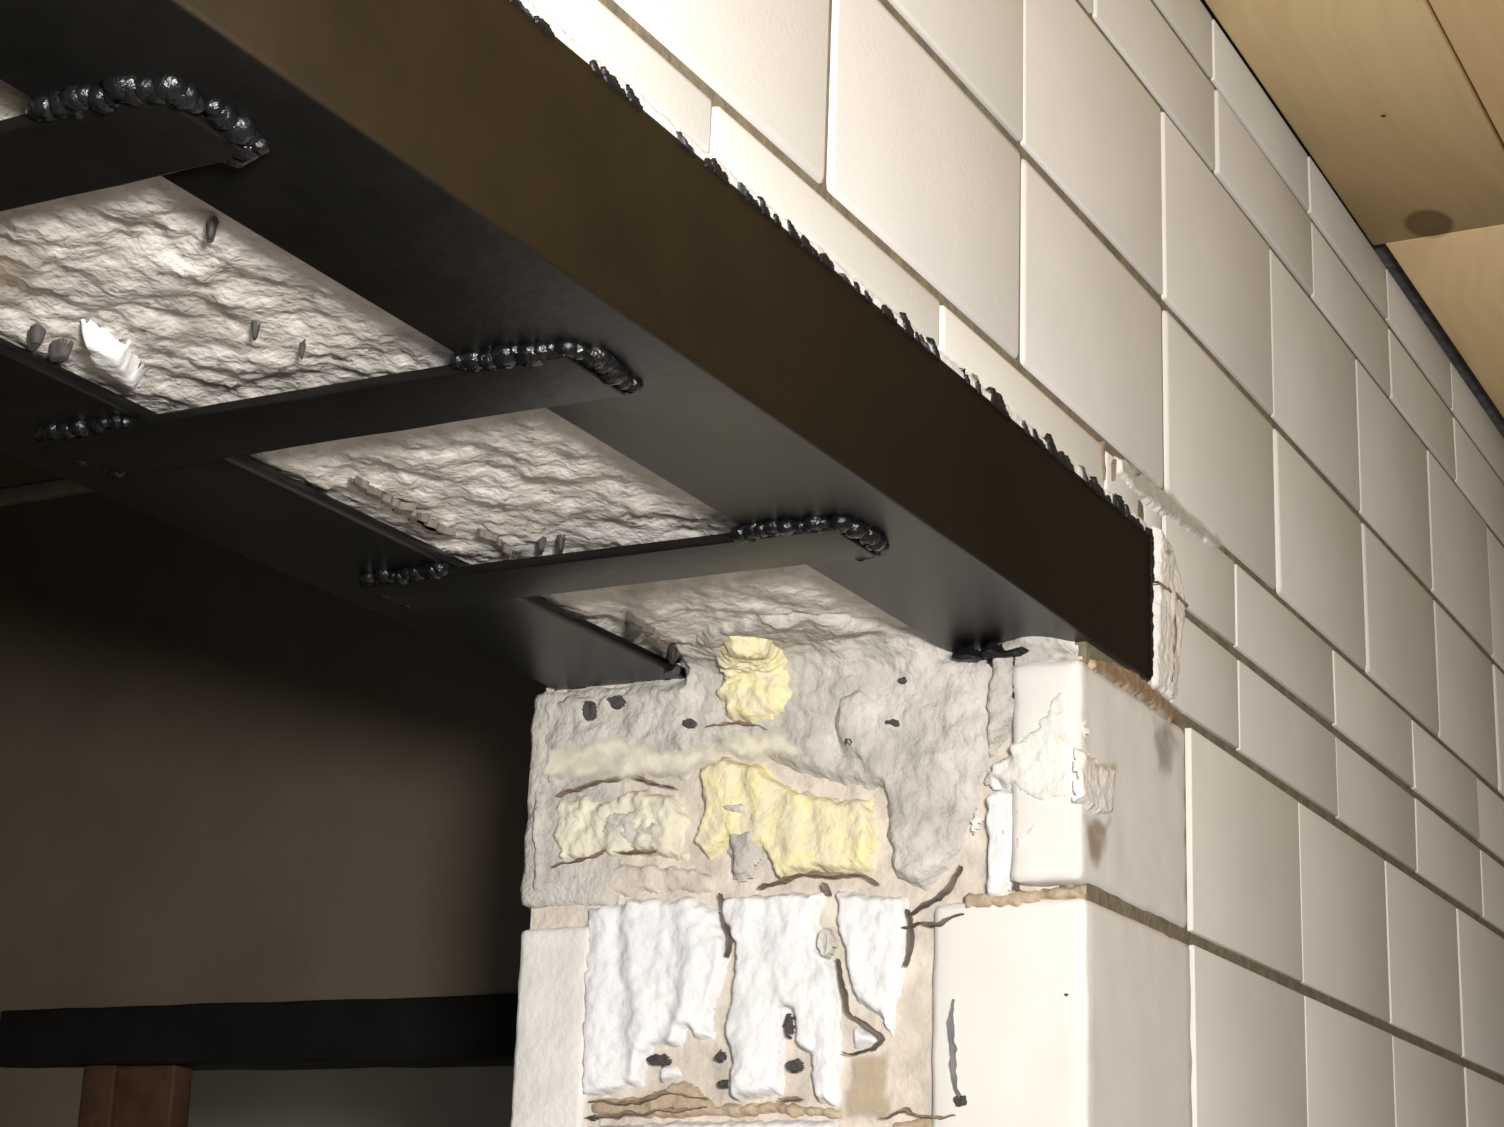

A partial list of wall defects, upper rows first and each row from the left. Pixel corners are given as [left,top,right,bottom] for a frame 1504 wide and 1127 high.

spalling [624,618,642,639]
spalling [664,642,681,677]
spalling [715,635,793,723]
spalling [582,695,626,722]
spalling [682,718,698,729]
crack [718,865,965,967]
spalling [553,757,909,1127]
crack [836,958,886,1055]
spalling [953,1095,967,1107]